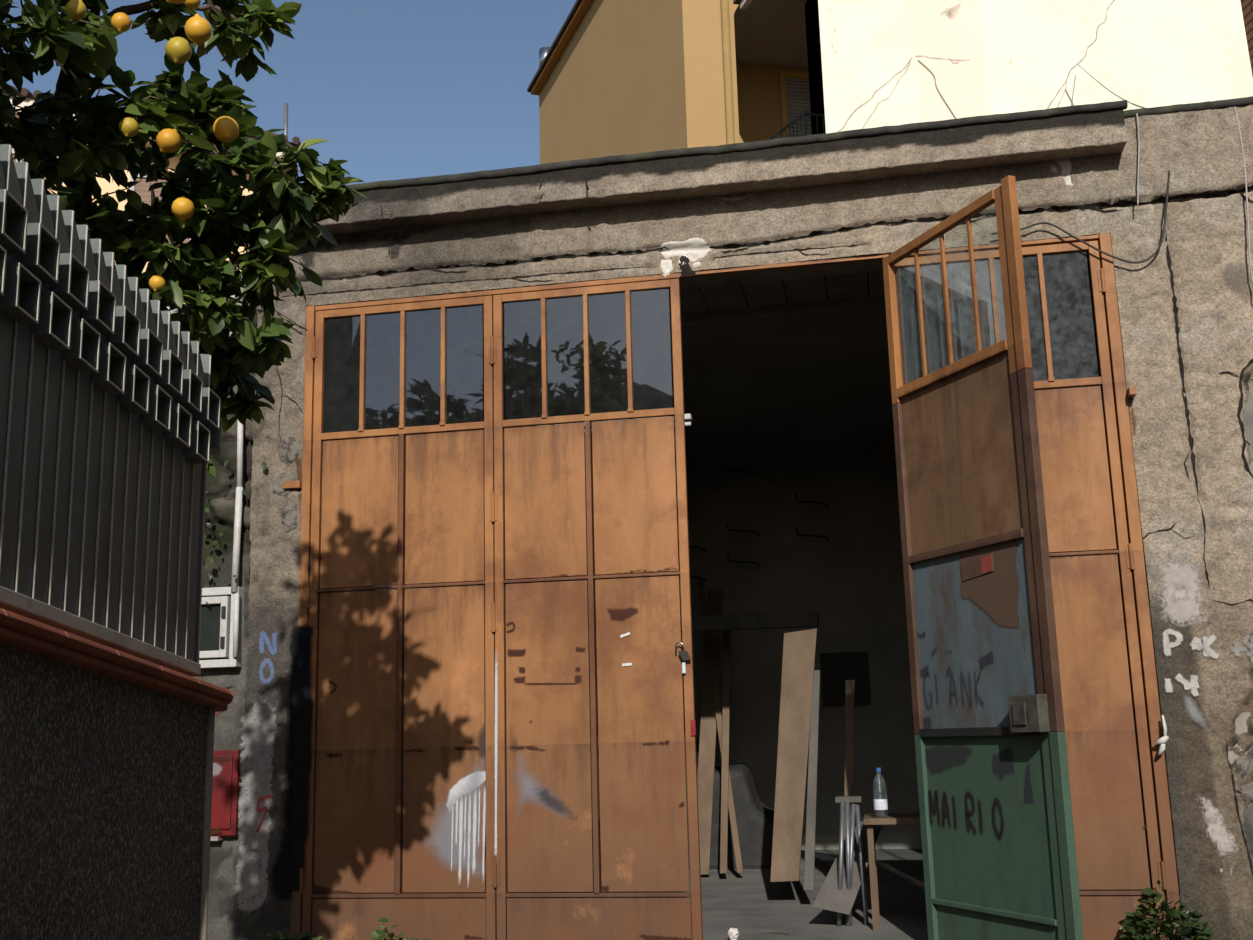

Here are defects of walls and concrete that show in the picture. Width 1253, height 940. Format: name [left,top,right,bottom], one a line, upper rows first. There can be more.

crack [838,55,961,132]
crack [1047,0,1114,109]
crack [1225,736,1253,875]